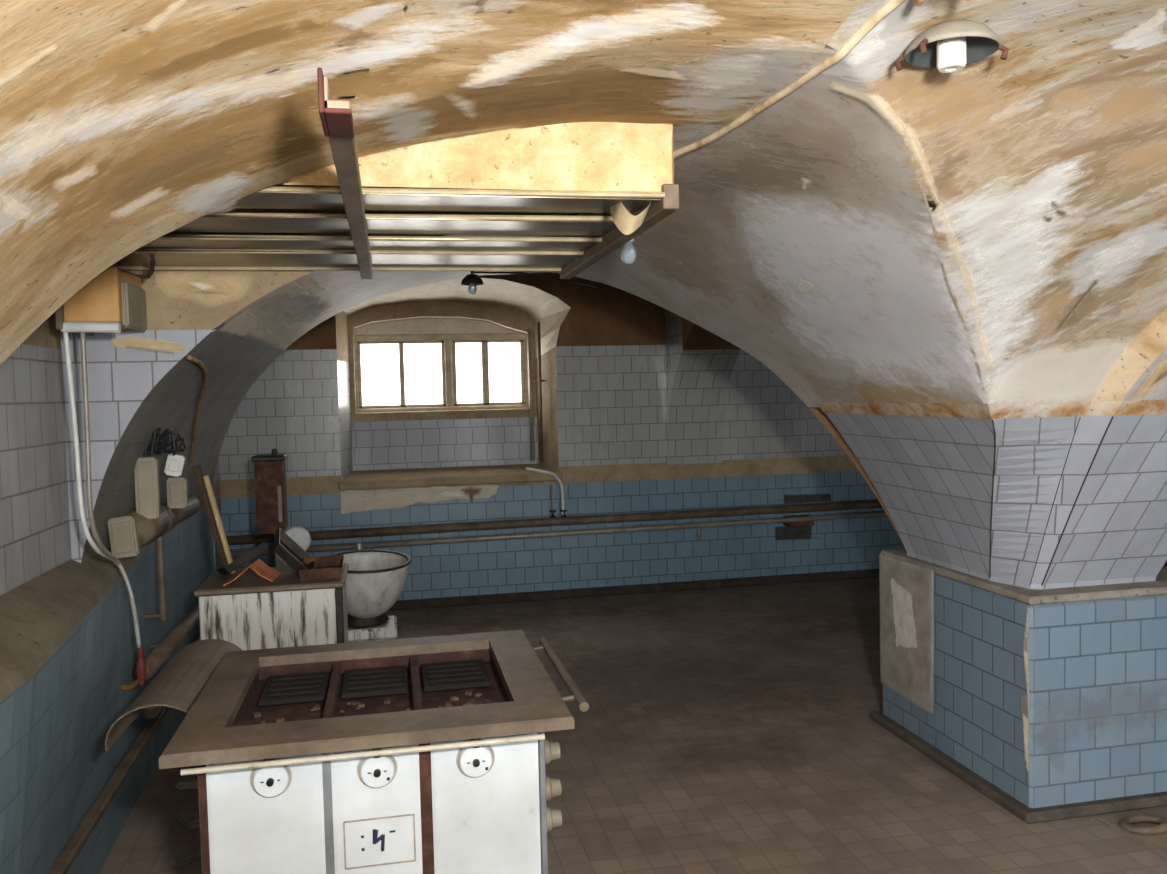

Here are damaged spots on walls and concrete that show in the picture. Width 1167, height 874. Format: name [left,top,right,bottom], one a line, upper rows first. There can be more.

flaking render [1112,11,1167,49]
peeling [0,0,523,234]
flaking render [741,162,1167,404]
peeling [340,484,499,514]
peeling [891,578,918,648]